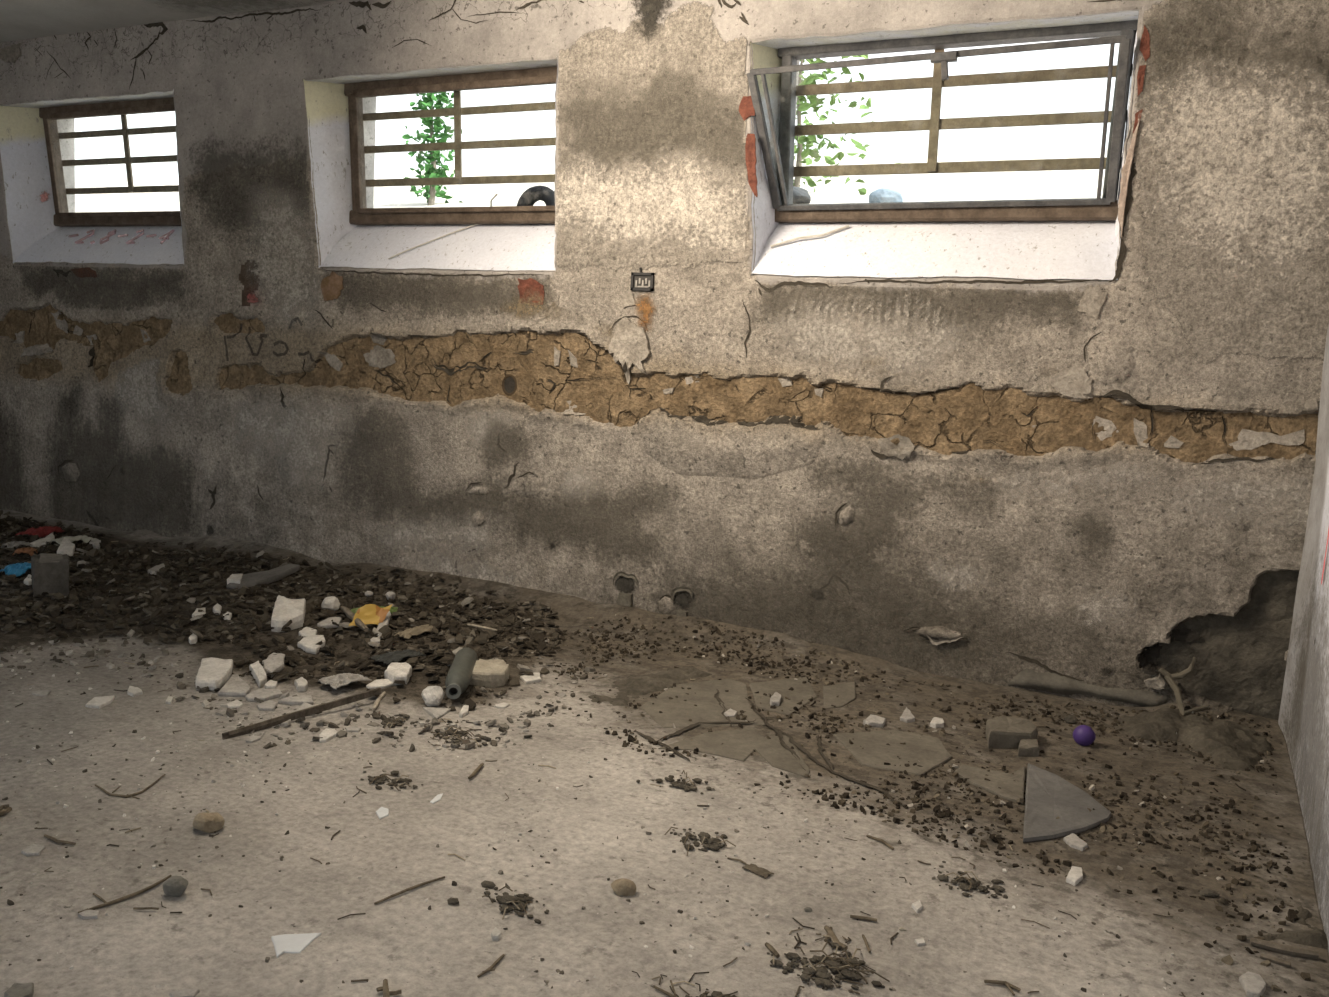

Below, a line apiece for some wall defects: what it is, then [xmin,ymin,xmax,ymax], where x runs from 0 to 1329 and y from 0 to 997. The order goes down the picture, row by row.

crack [85,27,161,89]
leakage [555,71,747,263]
leakage [190,139,553,318]
flaking render [363,332,396,369]
flaking render [608,293,651,385]
flaking render [1049,367,1093,399]
leakage [48,360,191,536]
flaking render [1092,416,1183,448]
flaking render [1228,429,1305,451]
leakage [236,406,1028,676]
leakage [1194,479,1309,514]
spalling [1138,570,1299,720]